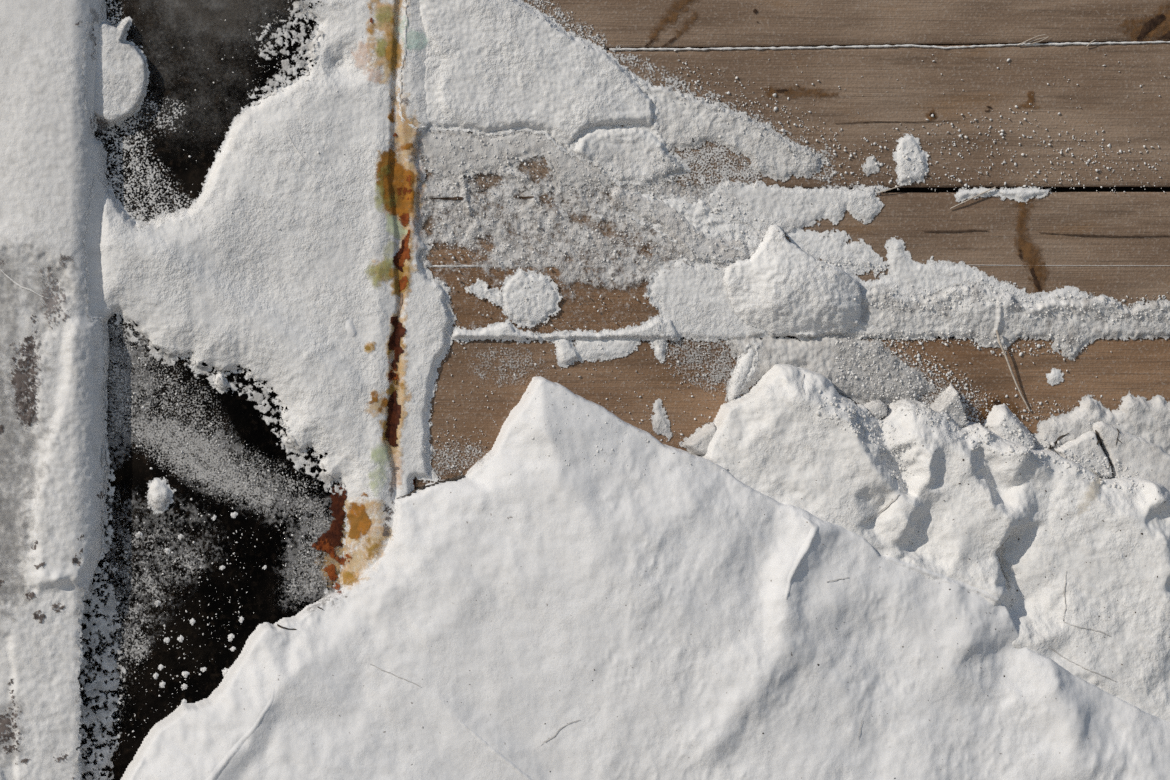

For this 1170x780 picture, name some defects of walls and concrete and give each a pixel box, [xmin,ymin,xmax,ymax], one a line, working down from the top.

peeling [82,16,150,128]
corrosion [356,0,402,83]
peeling [209,372,230,394]
corrosion [312,88,421,595]